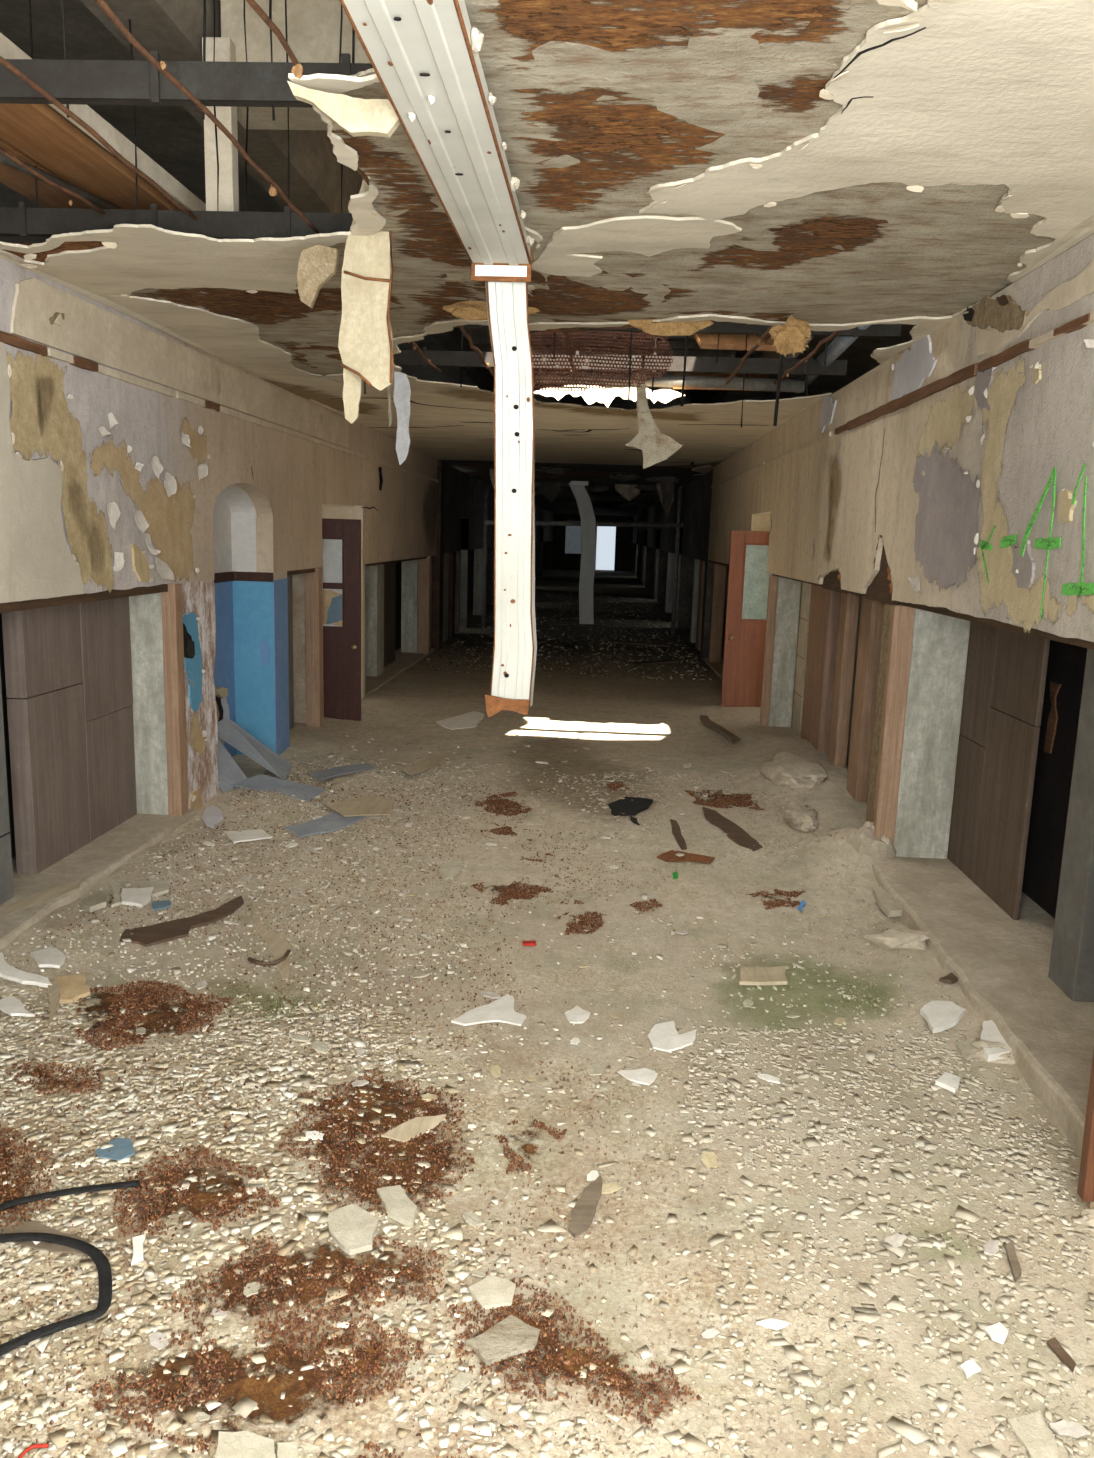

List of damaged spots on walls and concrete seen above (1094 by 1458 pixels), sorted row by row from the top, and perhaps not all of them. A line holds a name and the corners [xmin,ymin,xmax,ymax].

flaking render [335,68,389,100]
flaking render [119,242,346,378]
flaking render [327,122,486,338]
flaking render [464,0,1094,633]